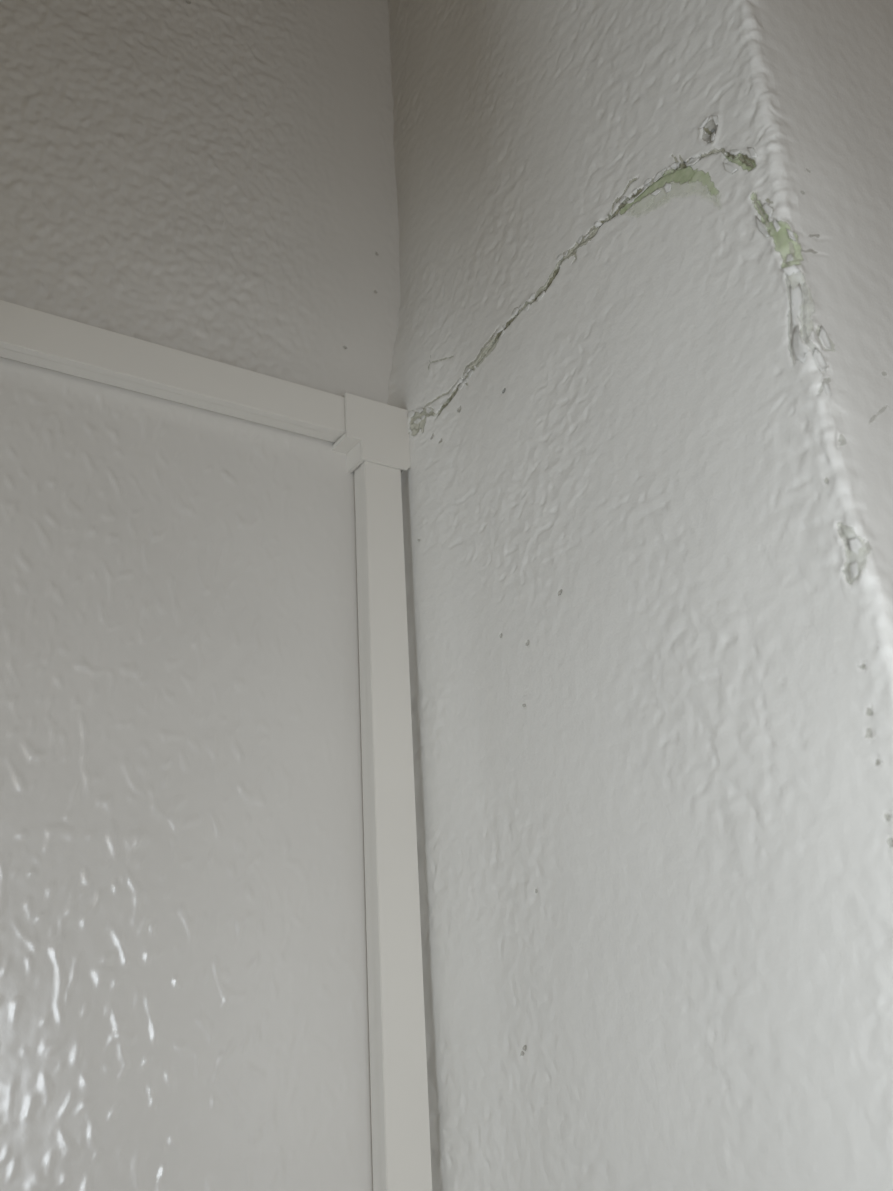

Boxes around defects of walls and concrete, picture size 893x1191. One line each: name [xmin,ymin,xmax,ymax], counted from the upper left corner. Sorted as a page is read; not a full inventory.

crack [410,127,753,427]
spalling [751,193,835,396]
spalling [837,523,872,584]